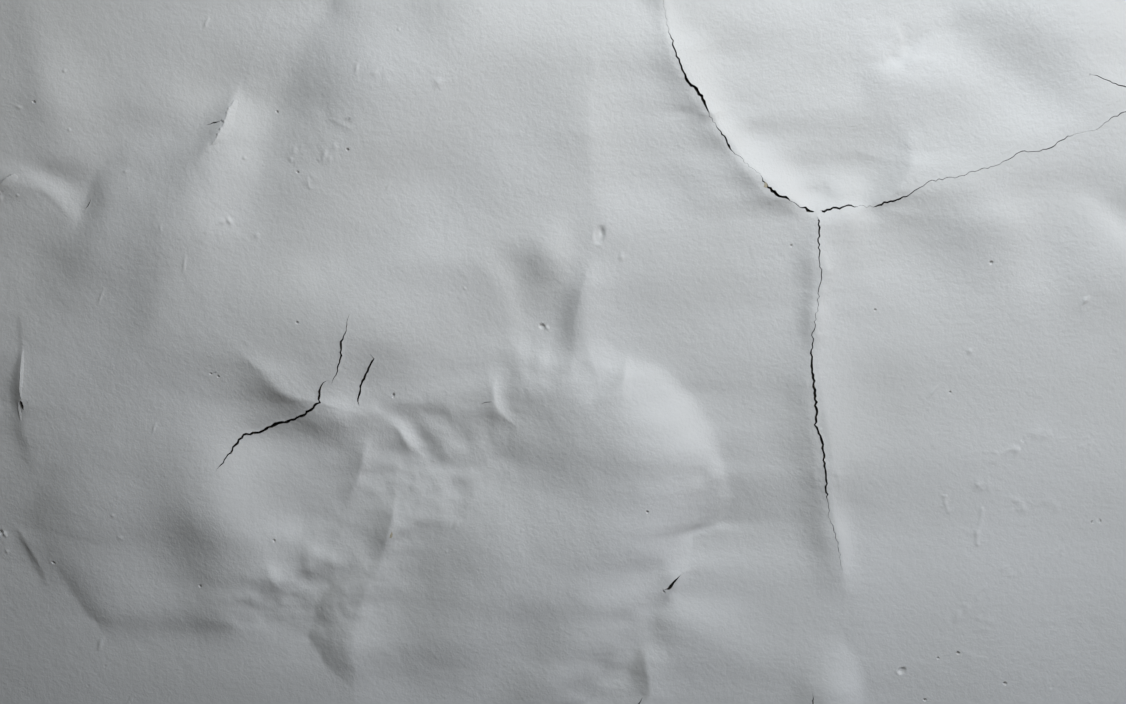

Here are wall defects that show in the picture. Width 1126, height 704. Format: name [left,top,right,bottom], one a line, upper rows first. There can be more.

crack [212,313,379,474]
crack [658,0,1126,575]